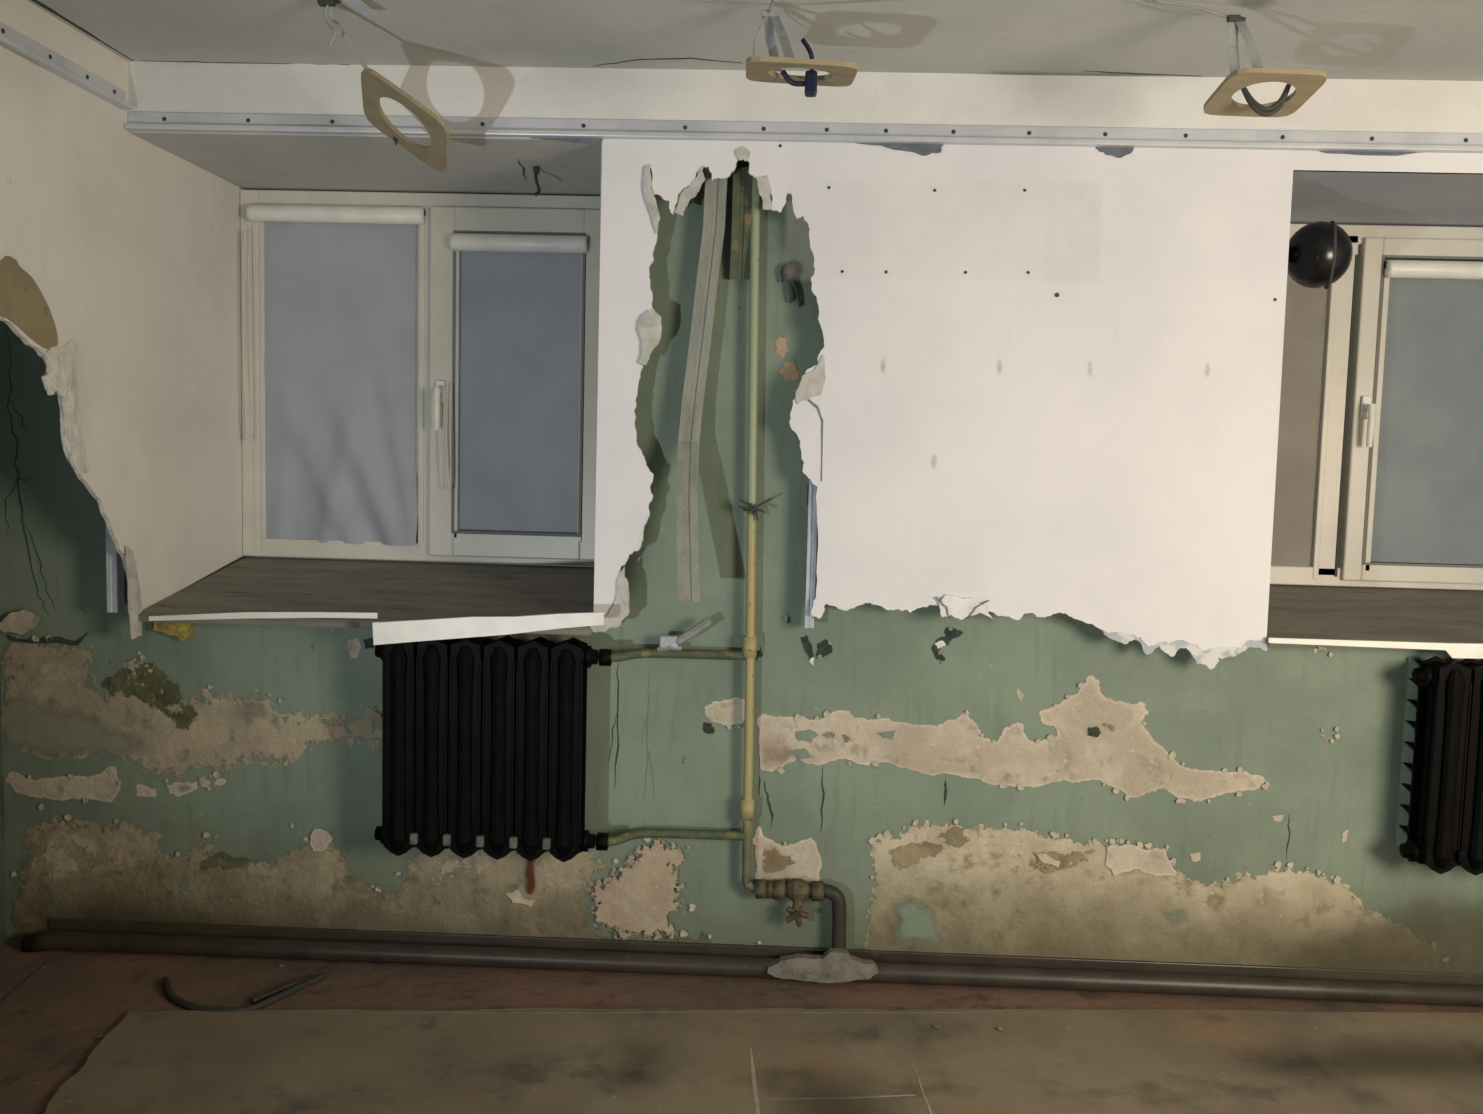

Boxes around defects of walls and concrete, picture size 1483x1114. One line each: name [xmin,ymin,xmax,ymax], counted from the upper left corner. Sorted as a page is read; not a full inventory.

peeling [0,256,58,350]
peeling [775,336,800,382]
crack [5,324,89,646]
peeling [0,635,712,943]
peeling [703,675,1270,804]
rust [526,859,535,894]
peeling [864,819,1408,967]